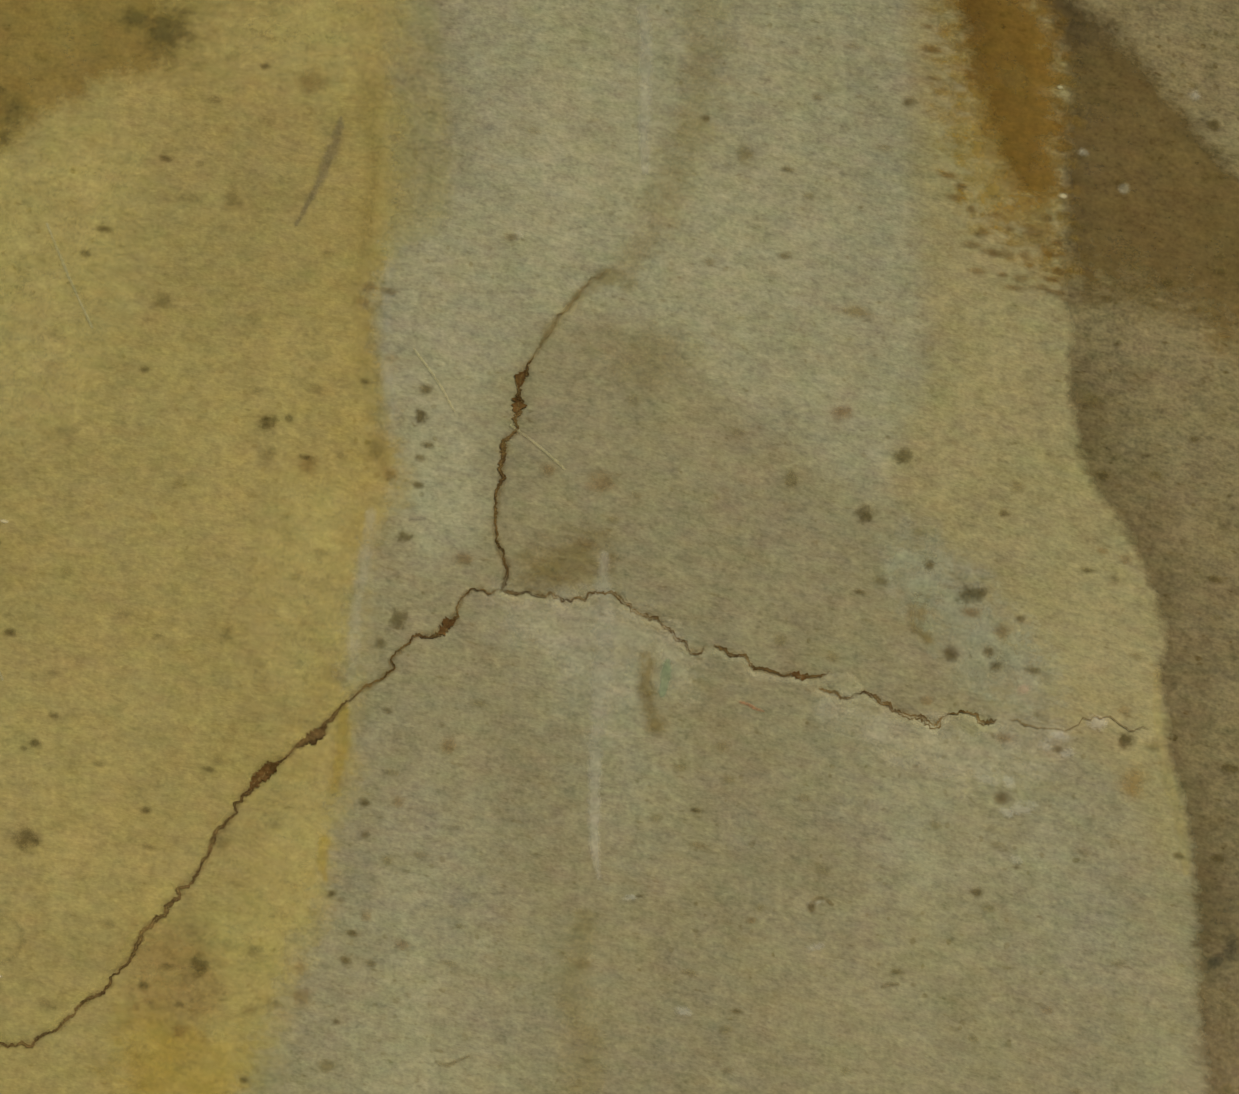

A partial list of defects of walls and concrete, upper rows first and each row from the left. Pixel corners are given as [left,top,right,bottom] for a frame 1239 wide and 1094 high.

rust [942,0,1064,230]
crack [0,271,1148,1048]
leakage [1040,0,1239,1094]